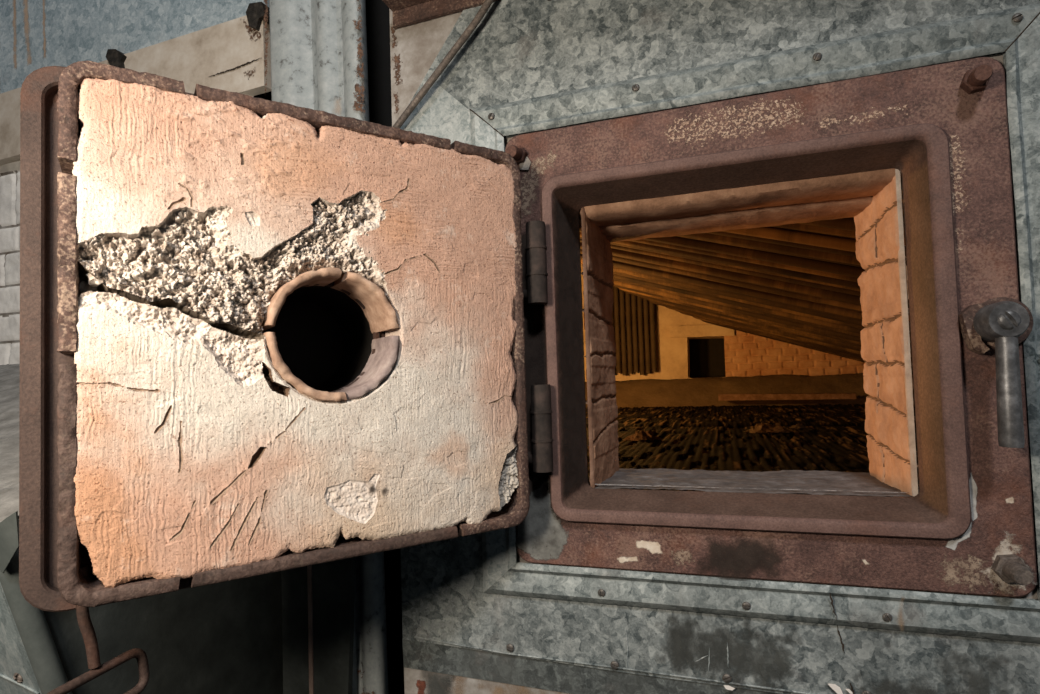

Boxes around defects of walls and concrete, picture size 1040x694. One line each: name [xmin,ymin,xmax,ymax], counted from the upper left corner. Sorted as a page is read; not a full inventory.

rust [352,0,365,112]
rust [391,24,403,113]
crack [78,262,265,339]
spalling [78,190,388,397]
peeling [324,473,380,524]